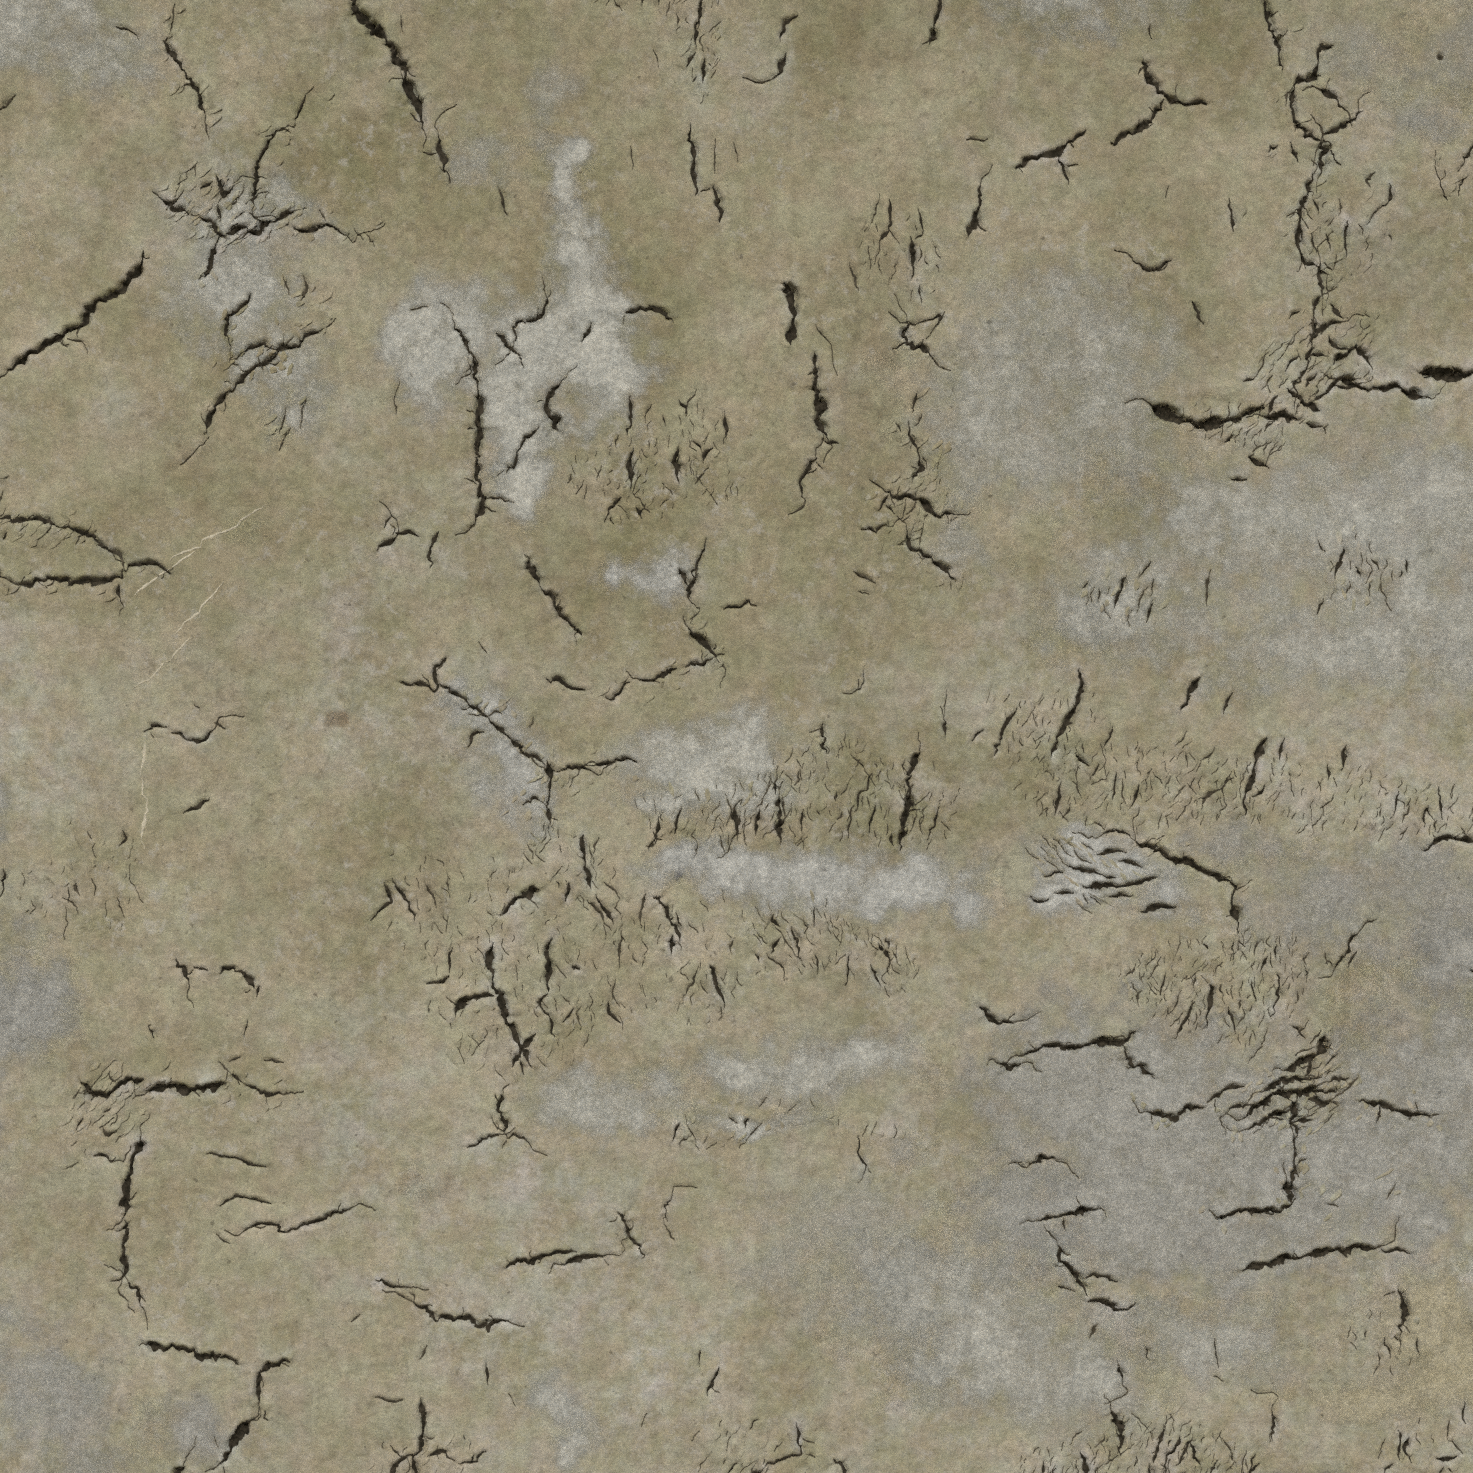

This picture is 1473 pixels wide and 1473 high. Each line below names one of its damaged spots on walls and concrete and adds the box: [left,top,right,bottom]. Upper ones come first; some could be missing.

crack [0,250,150,378]
crack [116,4,385,465]
crack [351,0,457,183]
crack [966,24,1208,236]
crack [1125,0,1473,433]
crack [0,509,173,616]
crack [402,657,639,853]
crack [60,958,304,1473]
crack [351,1278,525,1406]
crack [506,1185,697,1274]
crack [1009,1154,1136,1338]
crack [980,1007,1443,1271]